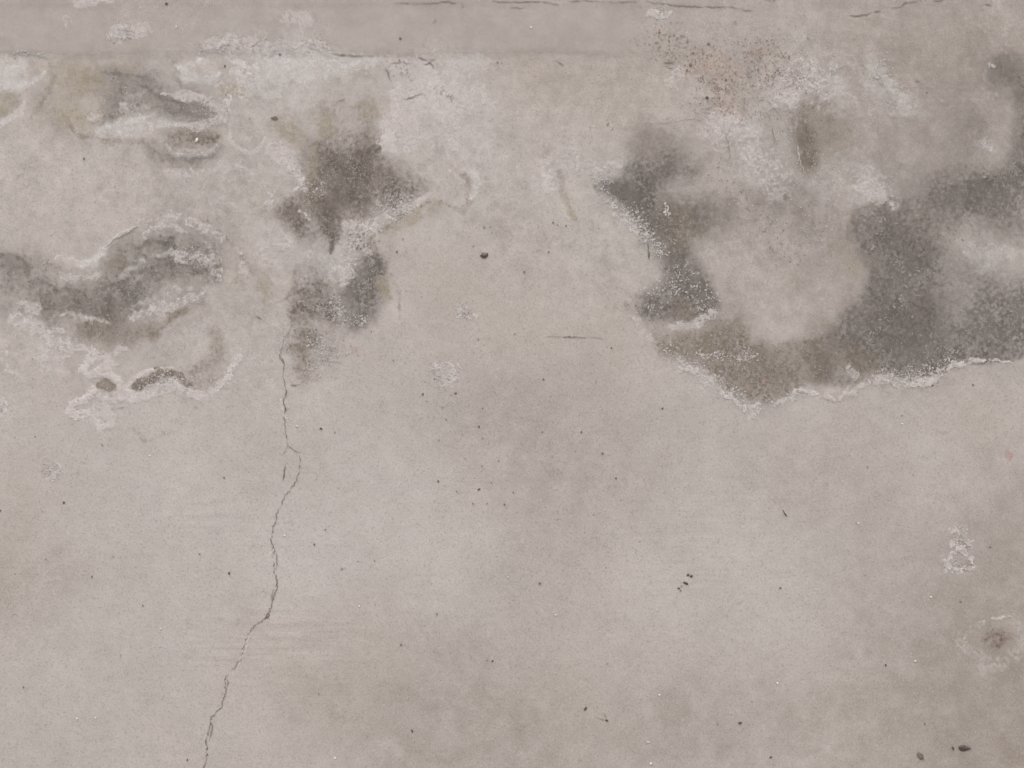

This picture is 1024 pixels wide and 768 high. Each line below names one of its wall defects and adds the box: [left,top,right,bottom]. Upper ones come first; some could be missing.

leakage [0,10,478,435]
leakage [540,46,1024,421]
crack [203,331,301,768]